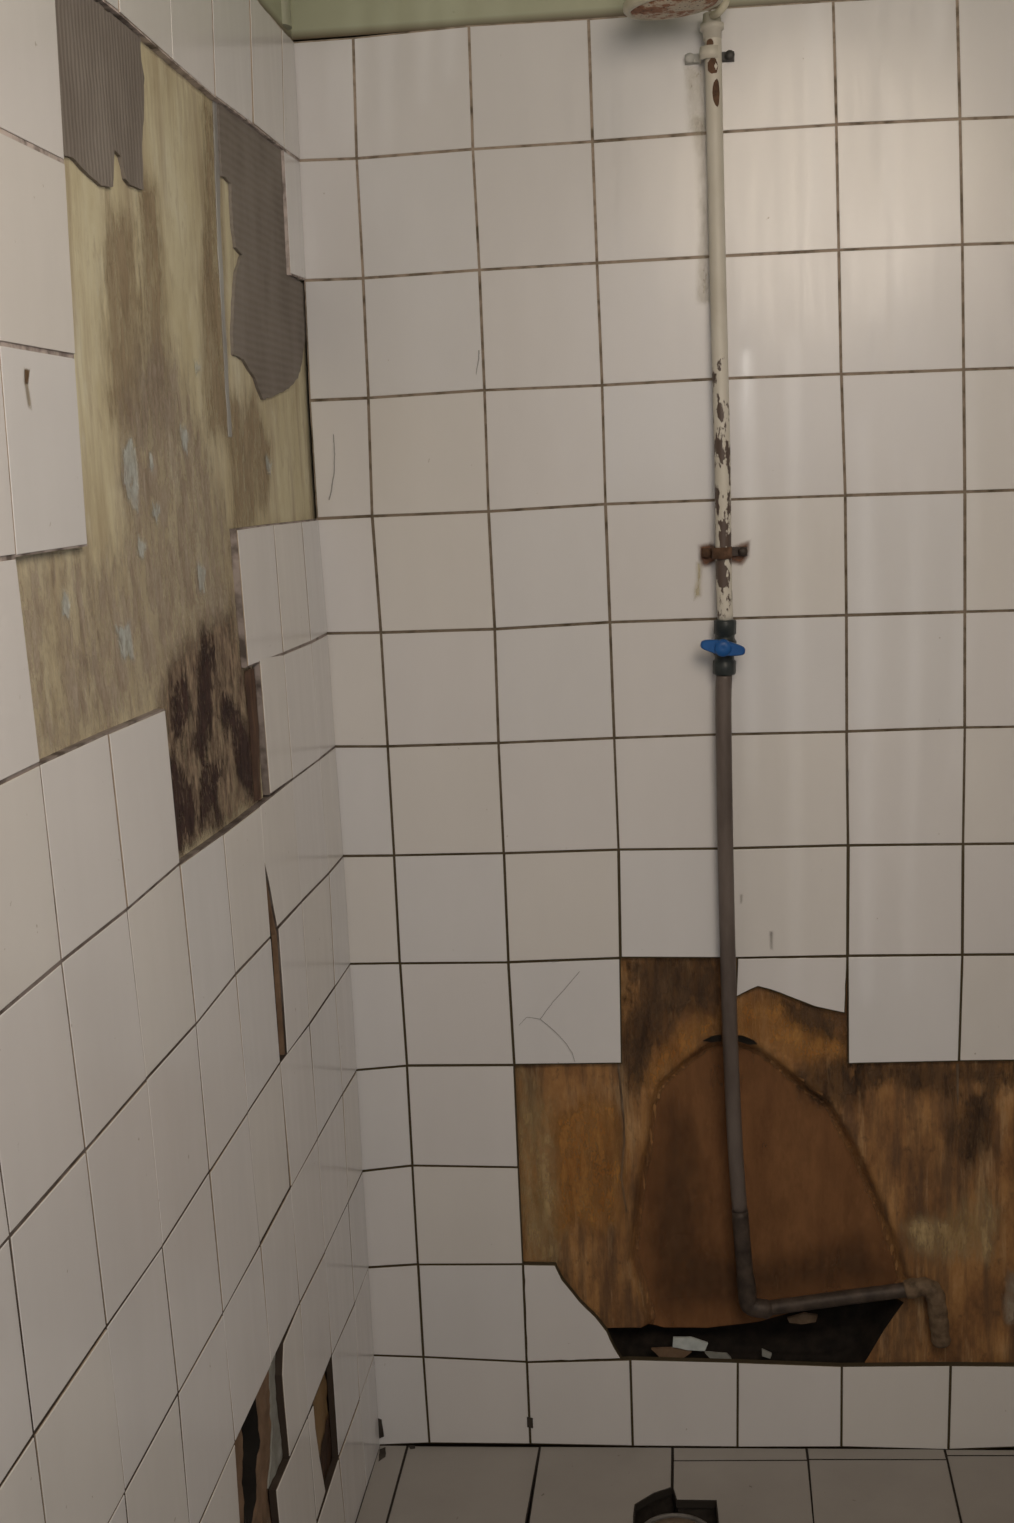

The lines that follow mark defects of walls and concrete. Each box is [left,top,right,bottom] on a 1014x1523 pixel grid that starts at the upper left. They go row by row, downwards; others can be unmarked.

rust [707,39,720,107]
peeling [15,0,316,859]
rust [696,544,748,595]
spalling [266,882,285,1055]
spalling [515,958,1014,1363]
spalling [234,1353,282,1523]
spalling [312,1373,332,1480]
spalling [635,1494,717,1523]